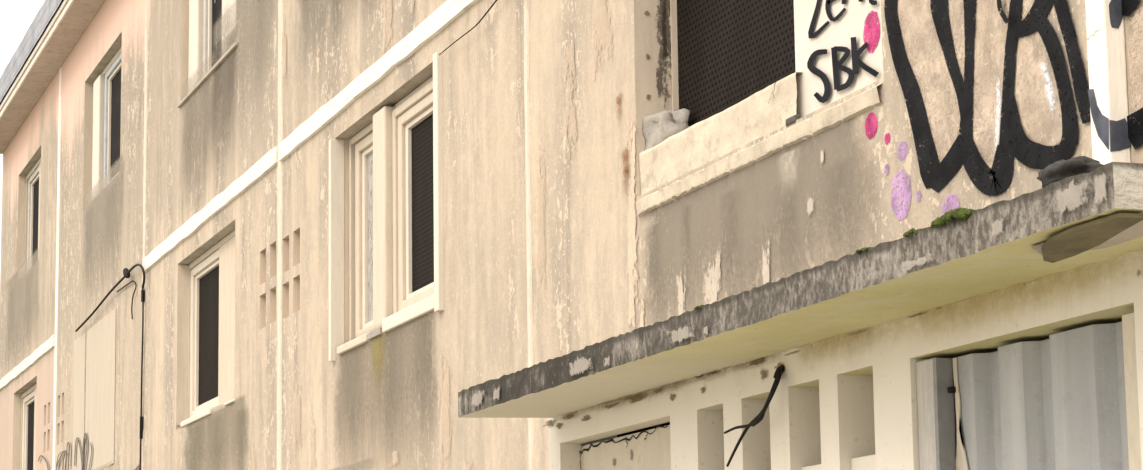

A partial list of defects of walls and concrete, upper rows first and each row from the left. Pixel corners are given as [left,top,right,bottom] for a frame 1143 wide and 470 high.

damp [184,0,271,150]
peeling [686,241,721,305]
peeling [762,230,770,285]
peeling [902,254,933,273]
peeling [991,220,1003,236]
spalling [1031,174,1143,263]
damp [337,313,433,438]
damp [186,398,244,470]
crack [580,425,667,467]